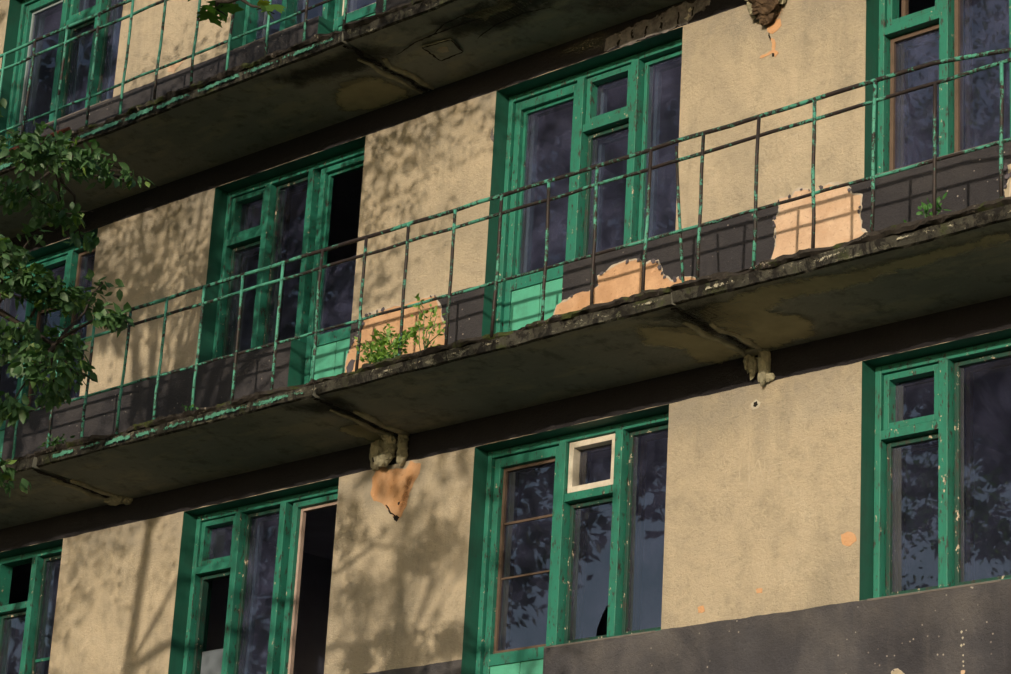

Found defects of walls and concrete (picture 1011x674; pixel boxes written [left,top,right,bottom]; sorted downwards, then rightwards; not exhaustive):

flaking render [760,18,782,58]
flaking render [1003,163,1011,197]
flaking render [771,182,867,267]
flaking render [553,257,696,316]
flaking render [345,294,445,373]
flaking render [370,460,421,522]